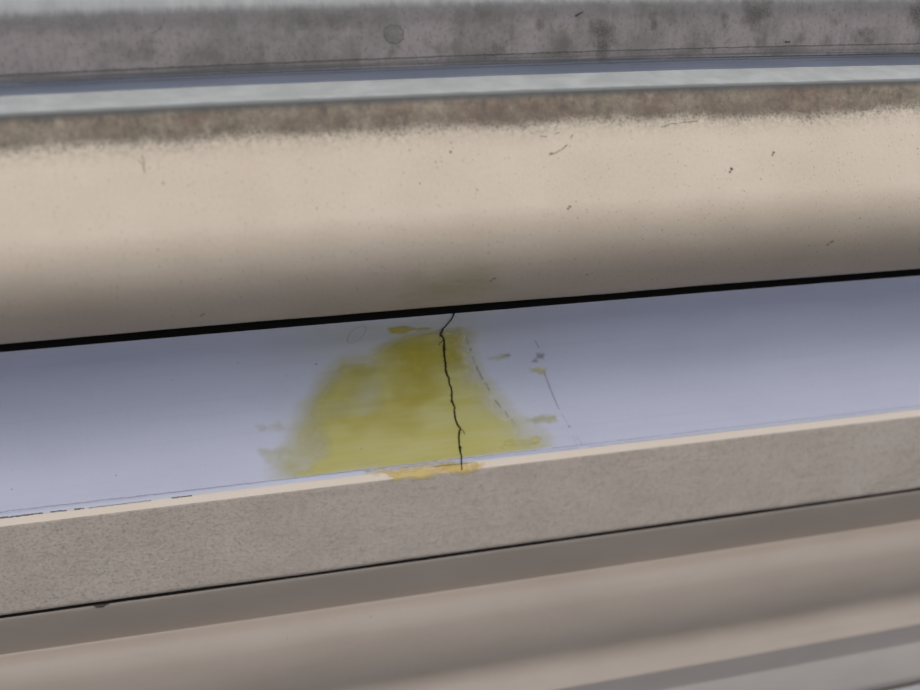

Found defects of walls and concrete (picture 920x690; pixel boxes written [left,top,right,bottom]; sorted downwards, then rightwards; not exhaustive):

damp [303,327,539,479]
crack [434,311,472,470]